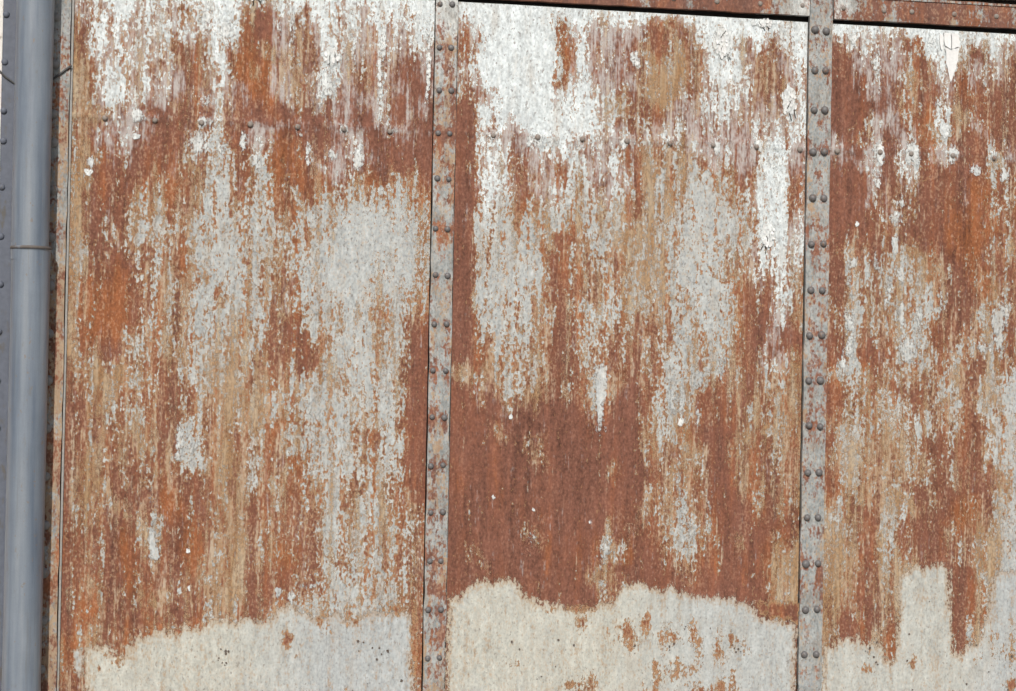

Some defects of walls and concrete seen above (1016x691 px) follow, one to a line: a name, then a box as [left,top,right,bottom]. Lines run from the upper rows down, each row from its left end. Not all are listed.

peeling [751,18,776,30]
peeling [927,32,960,81]
peeling [131,107,146,139]
peeling [188,92,226,159]
peeling [239,132,262,169]
peeling [353,143,364,171]
peeling [872,142,885,188]
peeling [903,139,921,169]
peeling [940,122,959,164]
corrosion [59,0,434,691]
corrosion [445,2,807,691]
corrosion [822,25,1016,691]